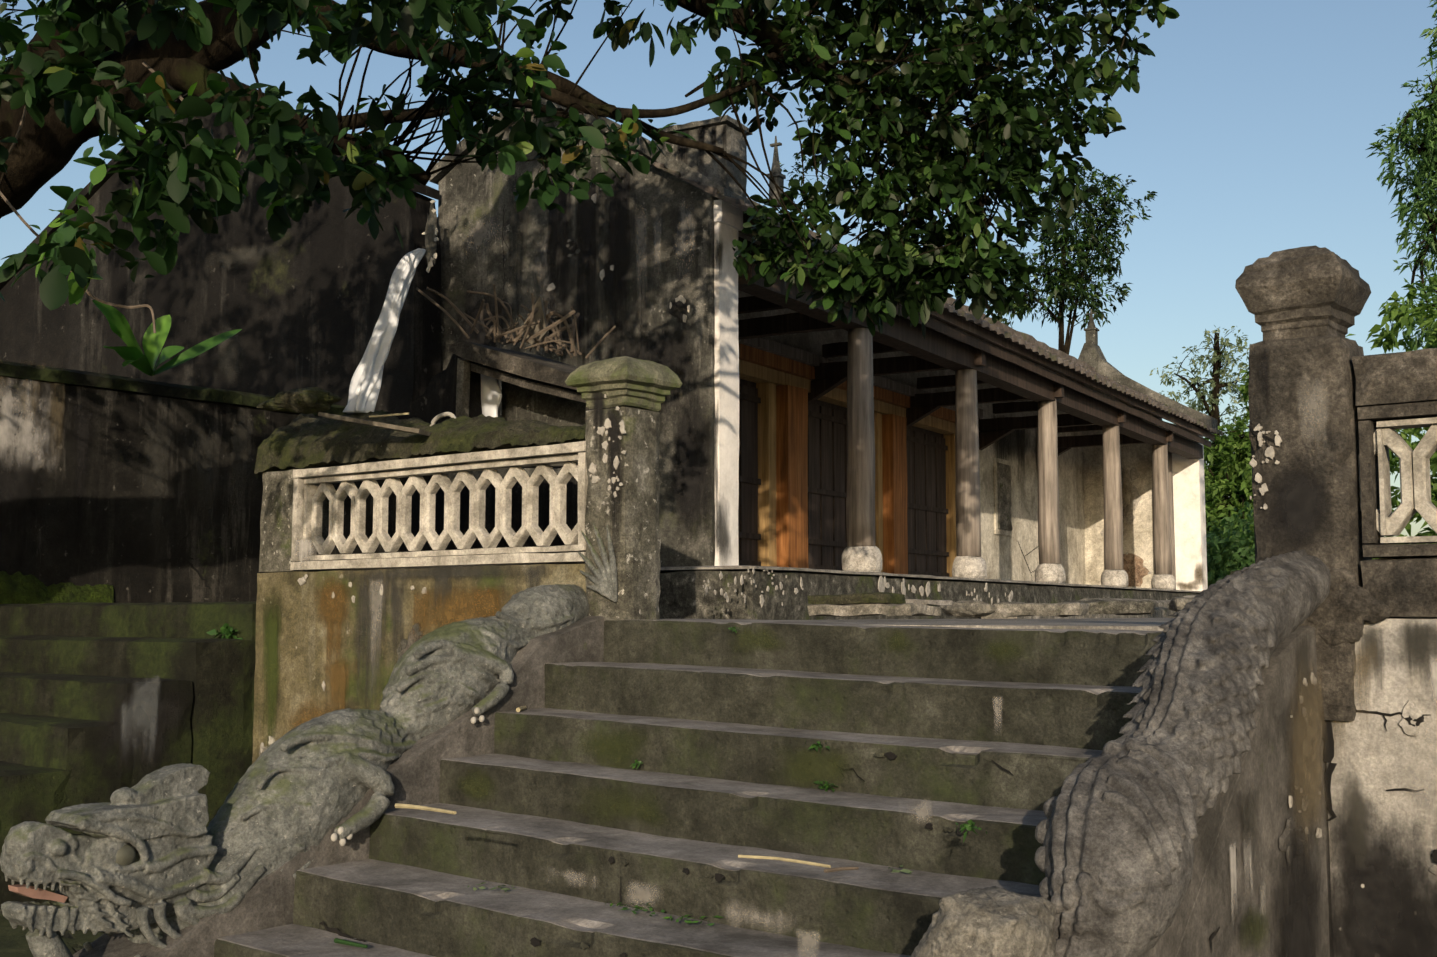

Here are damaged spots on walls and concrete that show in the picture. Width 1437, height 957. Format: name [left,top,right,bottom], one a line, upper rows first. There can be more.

water stain [540,164,729,554]
flaking render [669,295,690,323]
water stain [0,436,39,572]
flaking render [589,394,626,505]
flaking render [1249,424,1282,510]
water stain [264,614,278,739]
water stain [351,564,500,687]
flaking render [703,568,804,608]
flaking render [878,575,941,597]
flaking render [966,582,1013,605]
water stain [1230,792,1258,899]
water stain [1261,785,1437,957]